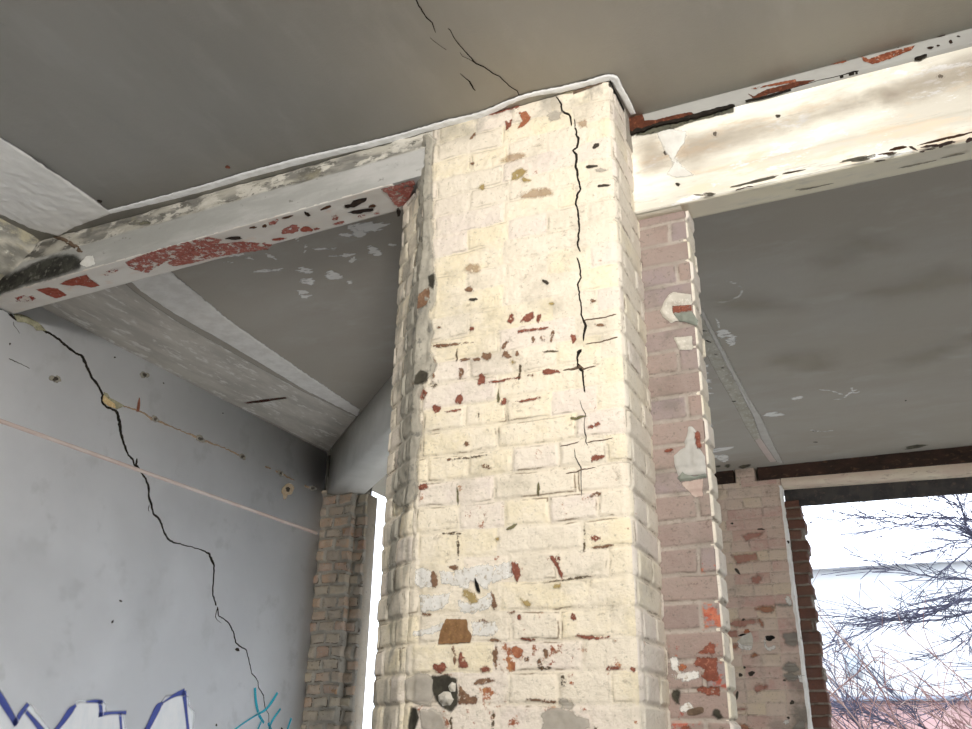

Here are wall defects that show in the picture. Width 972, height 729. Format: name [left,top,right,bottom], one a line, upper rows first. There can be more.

crack [416,0,520,96]
corrosion [629,112,693,131]
corrosion [748,79,814,98]
corrosion [862,46,914,64]
peeling [108,198,379,273]
flaking render [14,236,356,451]
peeling [433,327,560,405]
peeling [507,312,558,352]
crack [556,96,617,496]
crack [43,331,271,729]
peeling [405,532,521,729]
peeling [670,642,723,729]